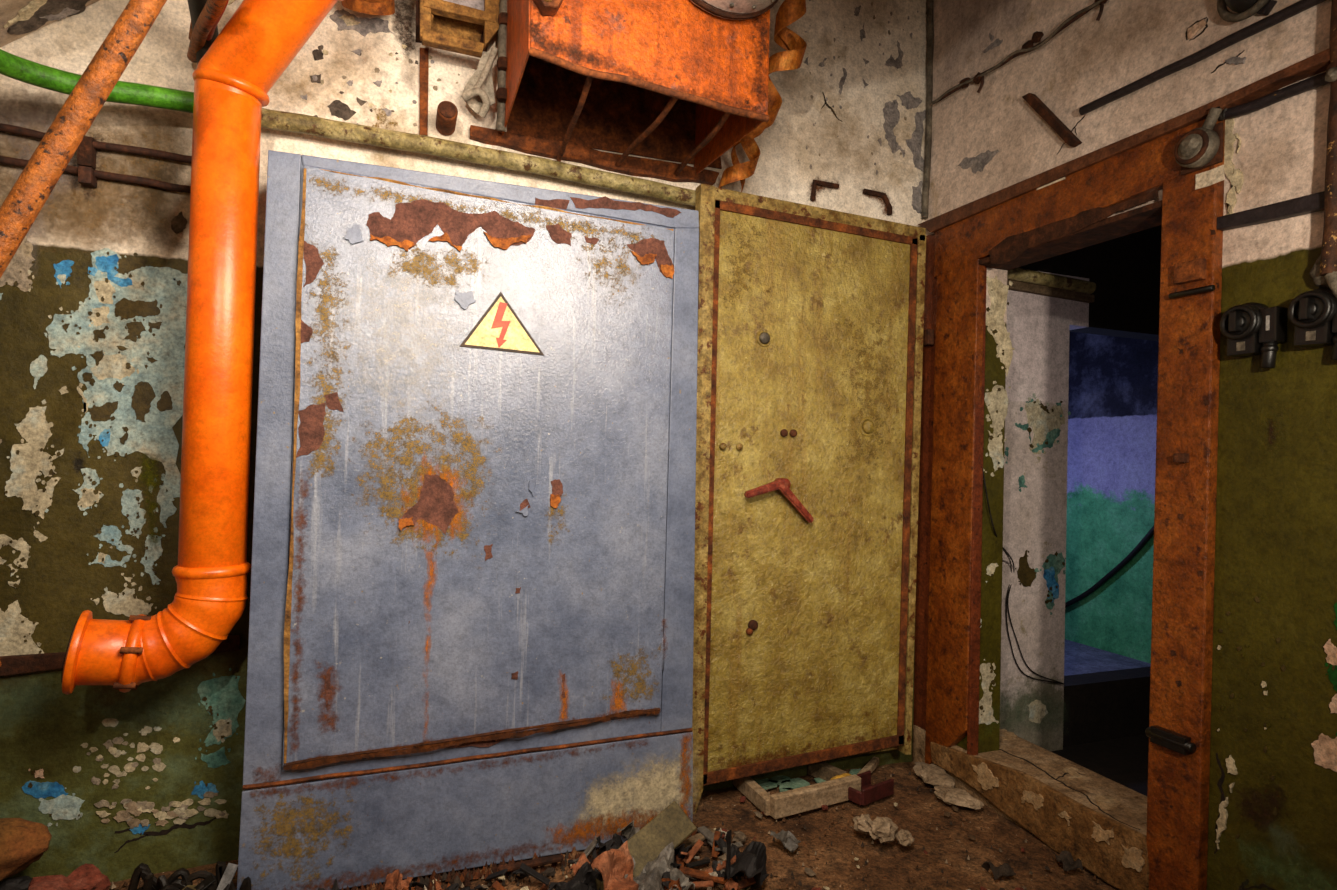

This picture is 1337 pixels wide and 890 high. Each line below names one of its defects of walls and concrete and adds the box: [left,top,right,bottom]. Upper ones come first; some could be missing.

flaking render [867,91,926,214]
peeling [0,234,35,300]
peeling [983,275,1071,477]
peeling [0,248,188,656]
peeling [986,563,999,582]
peeling [1015,550,1066,615]
peeling [22,668,246,834]
peeling [979,659,1017,744]
peeling [1311,733,1337,772]
peeling [1323,603,1337,713]
peeling [1214,753,1238,854]